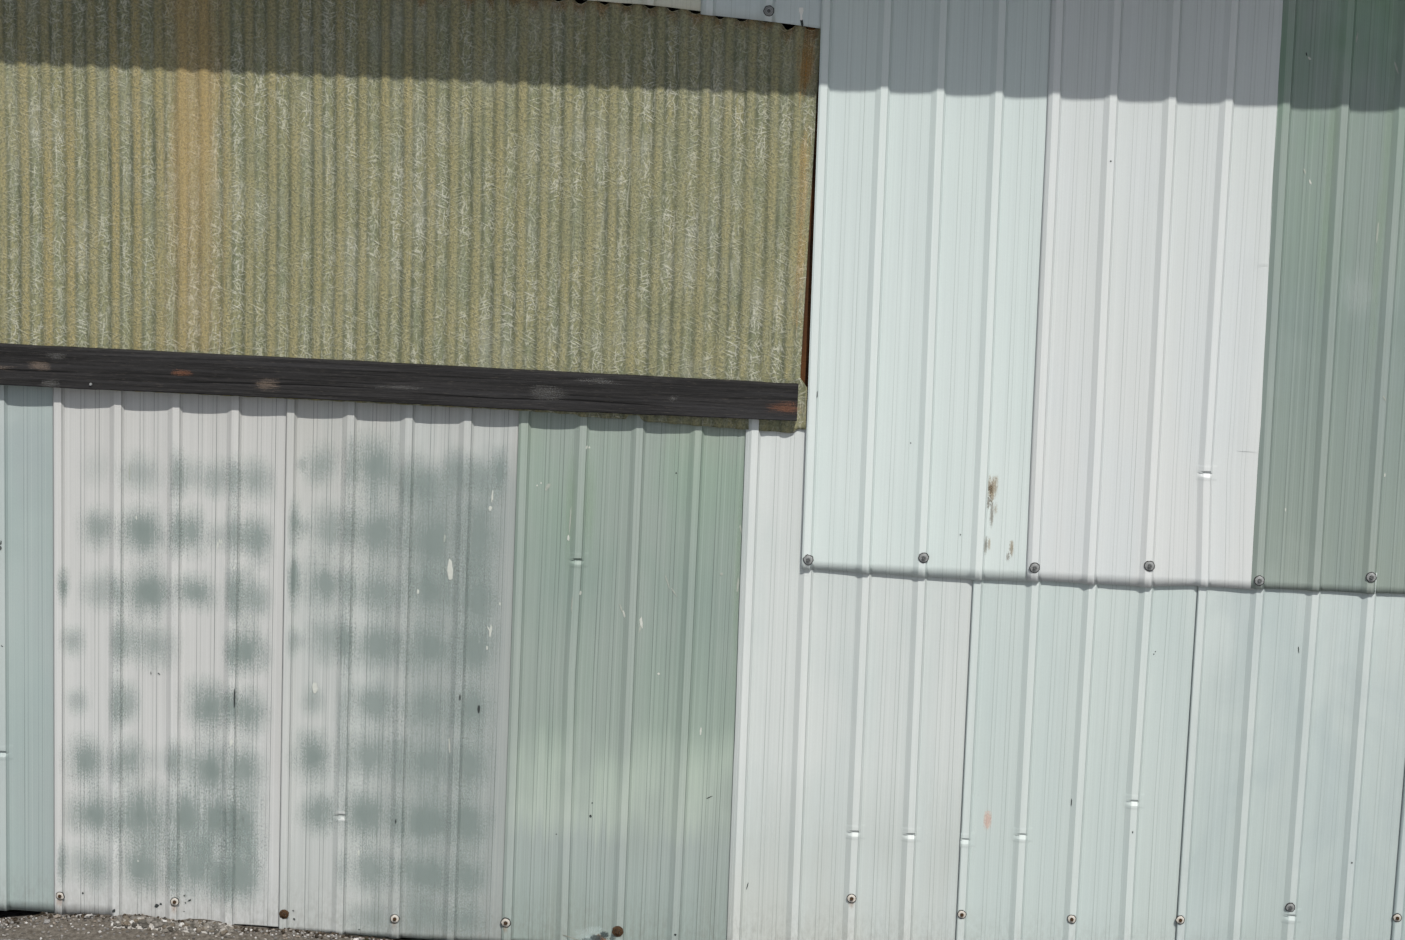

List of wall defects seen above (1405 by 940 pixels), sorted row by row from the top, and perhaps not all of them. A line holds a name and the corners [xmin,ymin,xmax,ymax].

leakage [89,513,160,550]
leakage [127,573,166,610]
leakage [289,561,340,598]
leakage [358,471,497,670]
leakage [79,747,259,896]
leakage [306,742,486,929]